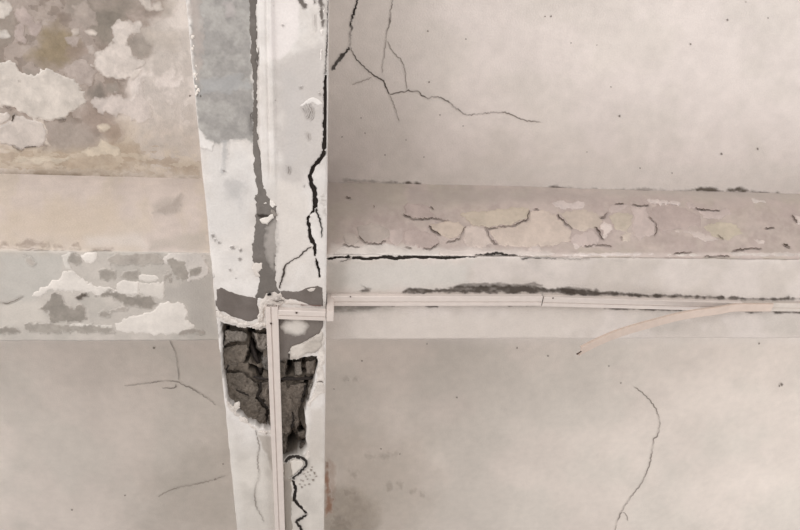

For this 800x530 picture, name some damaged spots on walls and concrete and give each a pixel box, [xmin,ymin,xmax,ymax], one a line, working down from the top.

peeling [0,0,154,166]
flaking render [186,0,260,152]
crack [272,0,590,304]
peeling [328,189,800,259]
crack [124,340,216,406]
spalling [216,310,271,435]
crack [283,454,308,530]
spalling [280,336,325,489]
damp [356,283,373,294]
damp [334,306,396,314]
damp [400,280,800,315]
crack [614,386,661,530]